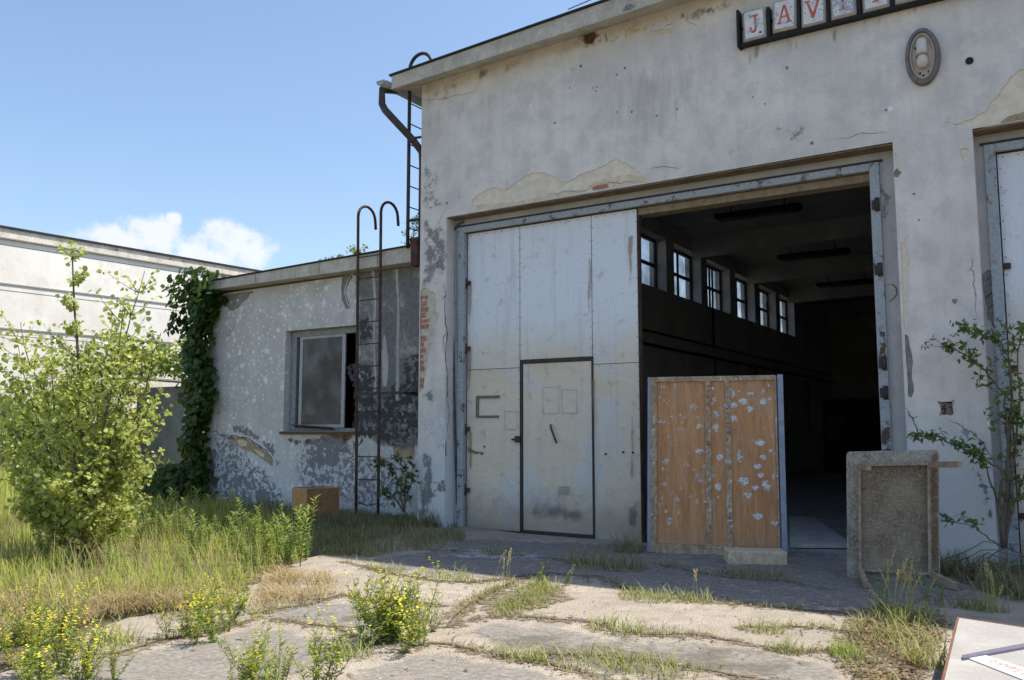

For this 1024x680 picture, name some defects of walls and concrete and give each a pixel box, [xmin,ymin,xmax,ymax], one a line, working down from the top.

peeling [955,69,1024,128]
peeling [472,159,648,211]
spalling [420,288,438,391]
peeling [216,426,283,505]
peeling [300,435,415,504]